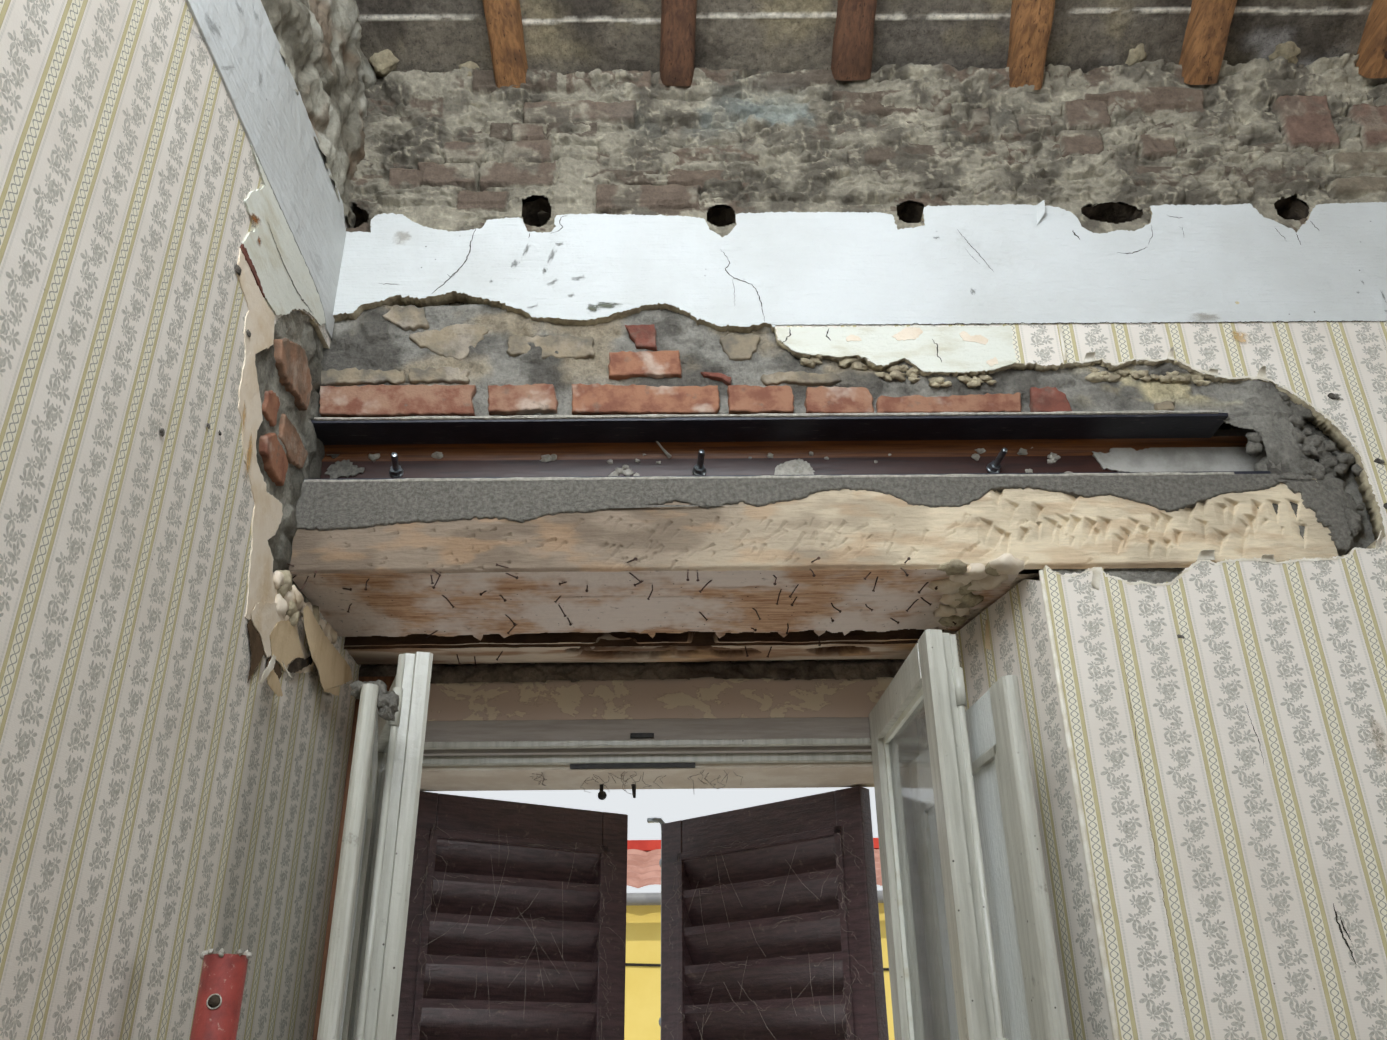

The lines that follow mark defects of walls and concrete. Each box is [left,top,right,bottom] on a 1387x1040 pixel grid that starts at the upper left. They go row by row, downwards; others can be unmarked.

flaking render [261,0,1387,237]
flaking render [235,145,1387,649]
crack [723,252,1386,348]
crack [1333,903,1357,965]